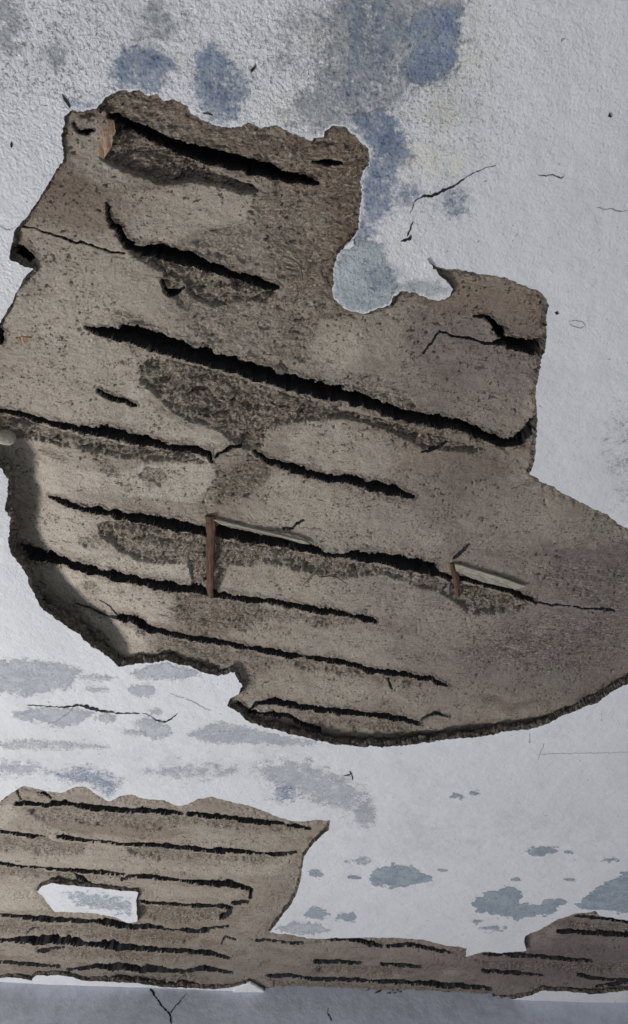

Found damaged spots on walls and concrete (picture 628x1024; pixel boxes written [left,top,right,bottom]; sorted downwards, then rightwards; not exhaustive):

damp [111,1,179,94]
damp [194,44,250,123]
damp [277,0,469,313]
crack [400,165,496,242]
spalling [0,90,628,748]
damp [0,658,121,796]
crack [27,694,208,724]
damp [124,662,198,740]
damp [188,721,311,747]
damp [258,759,375,828]
spalling [0,786,628,999]
crack [150,989,186,1024]